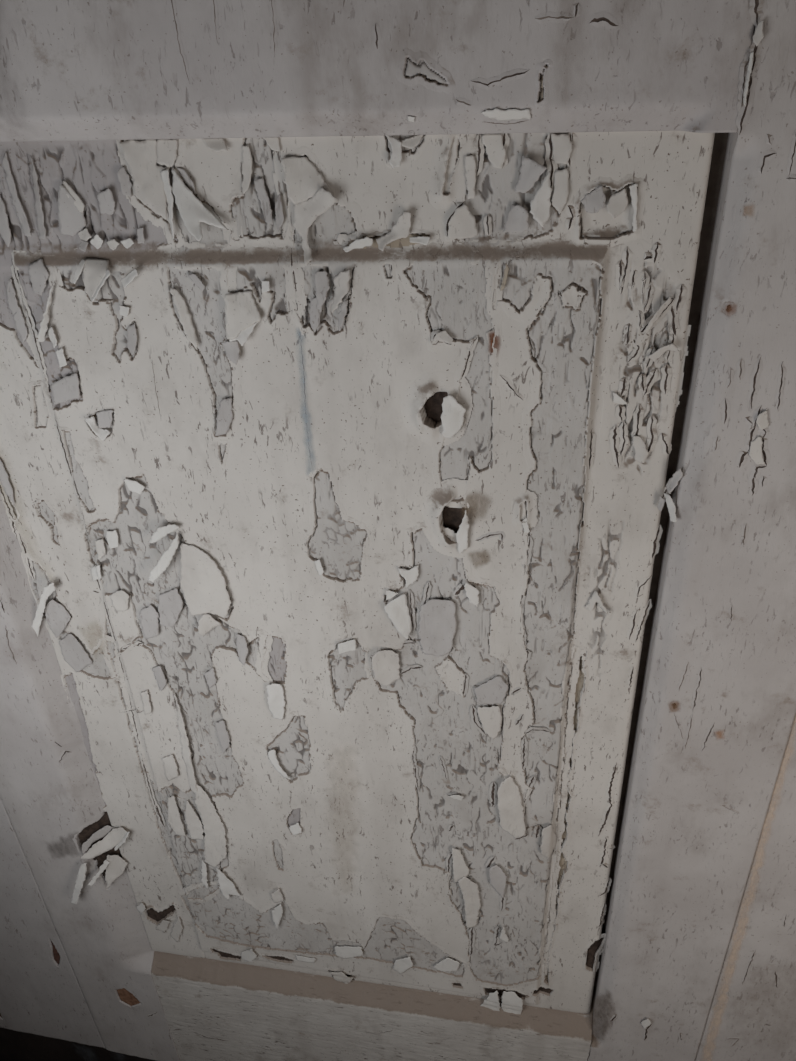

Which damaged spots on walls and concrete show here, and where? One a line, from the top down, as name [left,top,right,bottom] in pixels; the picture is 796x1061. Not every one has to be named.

peeling [395,48,456,94]
crack [736,0,796,183]
peeling [0,59,612,1014]